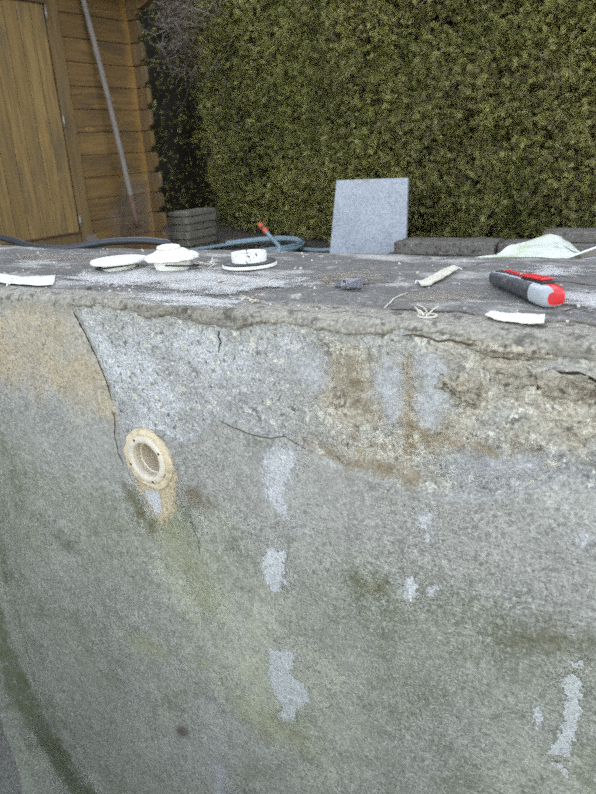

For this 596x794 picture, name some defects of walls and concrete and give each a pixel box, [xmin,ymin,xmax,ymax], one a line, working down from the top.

crack [72,310,123,463]
spalling [73,304,596,499]
corrosion [129,471,178,530]
damp [260,545,289,592]
damp [258,445,298,520]
damp [0,611,94,794]